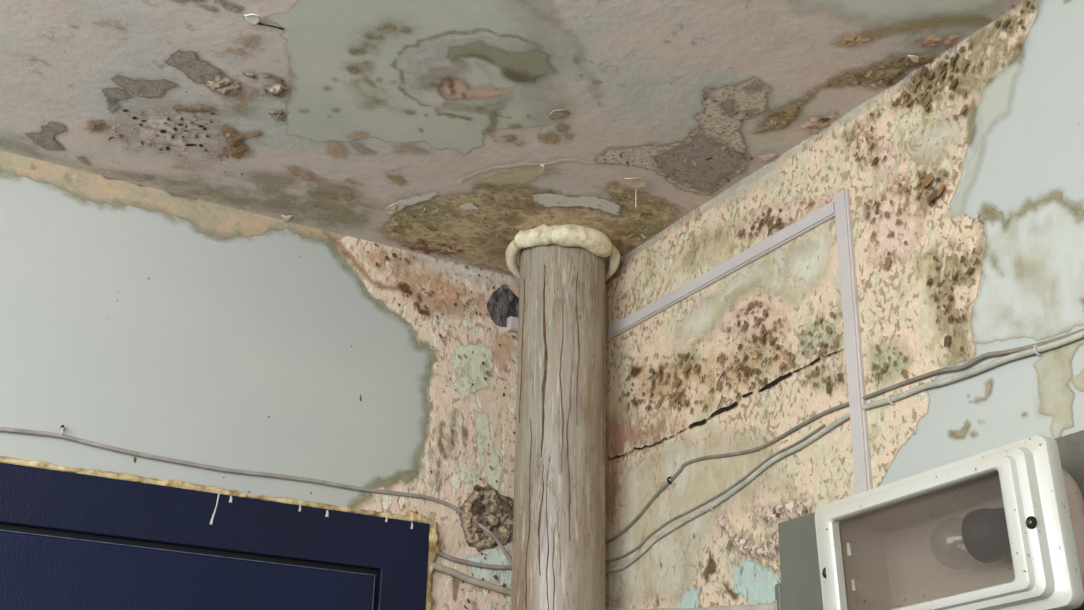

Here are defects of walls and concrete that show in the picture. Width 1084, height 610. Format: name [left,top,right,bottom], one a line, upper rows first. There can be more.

flaking render [88,50,289,178]
water stain [347,25,555,135]
water stain [847,102,893,153]
water stain [756,0,1035,134]
water stain [966,100,975,144]
water stain [382,167,678,273]
water stain [880,175,946,211]
peeling [0,122,520,610]
crack [607,349,842,461]
peeling [456,0,1038,609]
water stain [933,192,1084,439]